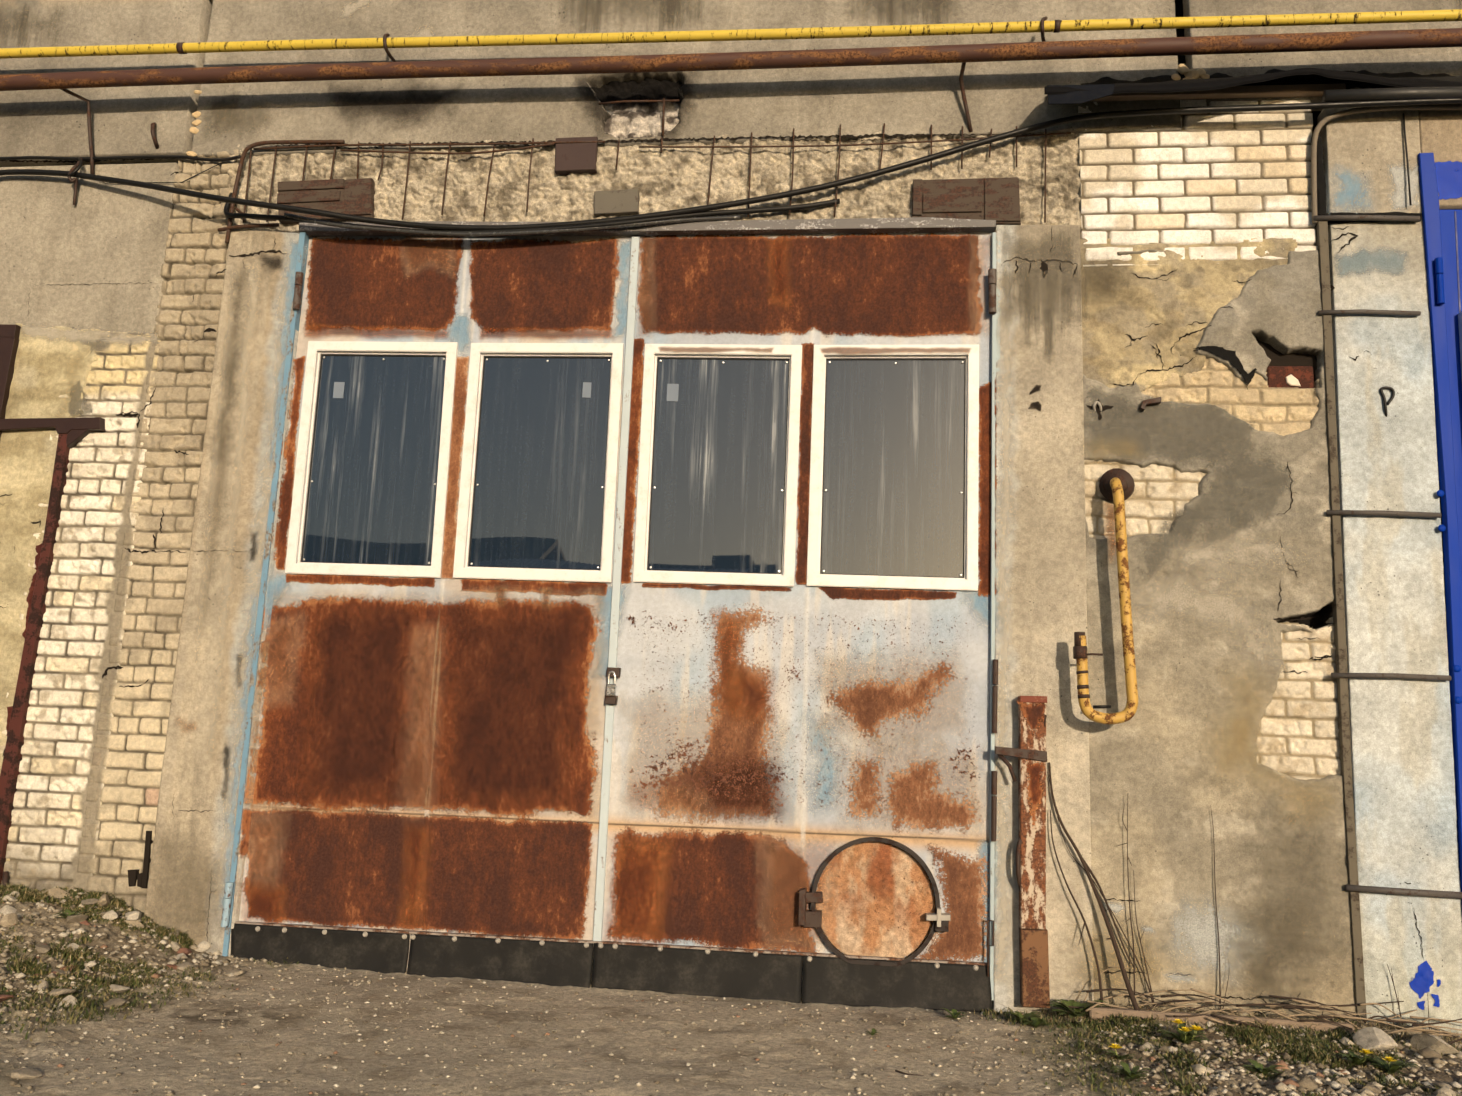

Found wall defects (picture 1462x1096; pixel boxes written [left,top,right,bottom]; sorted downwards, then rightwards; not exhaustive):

spalling [218,78,1320,436]
rust [239,233,990,961]
rust [978,379,997,597]
rust [1017,701,1047,736]
rust [1026,762,1045,829]
flaking render [1084,460,1207,539]
crack [1274,462,1332,674]
flaking render [1257,617,1353,784]